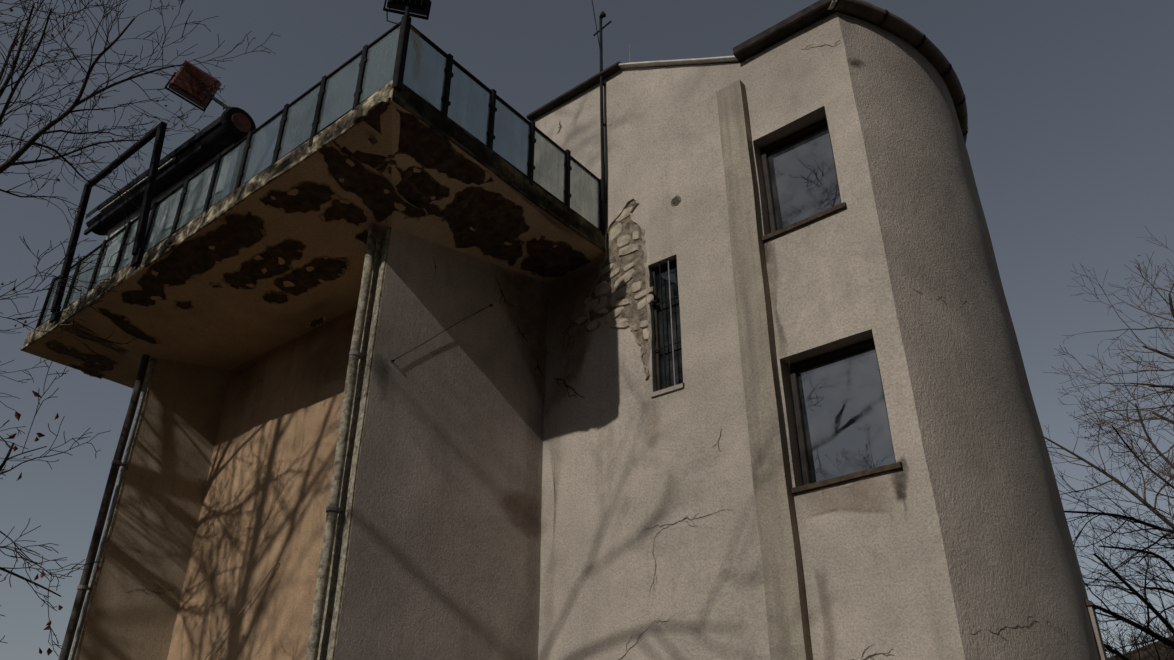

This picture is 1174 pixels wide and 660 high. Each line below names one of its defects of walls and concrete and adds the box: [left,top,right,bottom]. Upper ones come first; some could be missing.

spalling [97,101,654,379]
spalling [44,323,129,379]
crack [647,509,729,587]